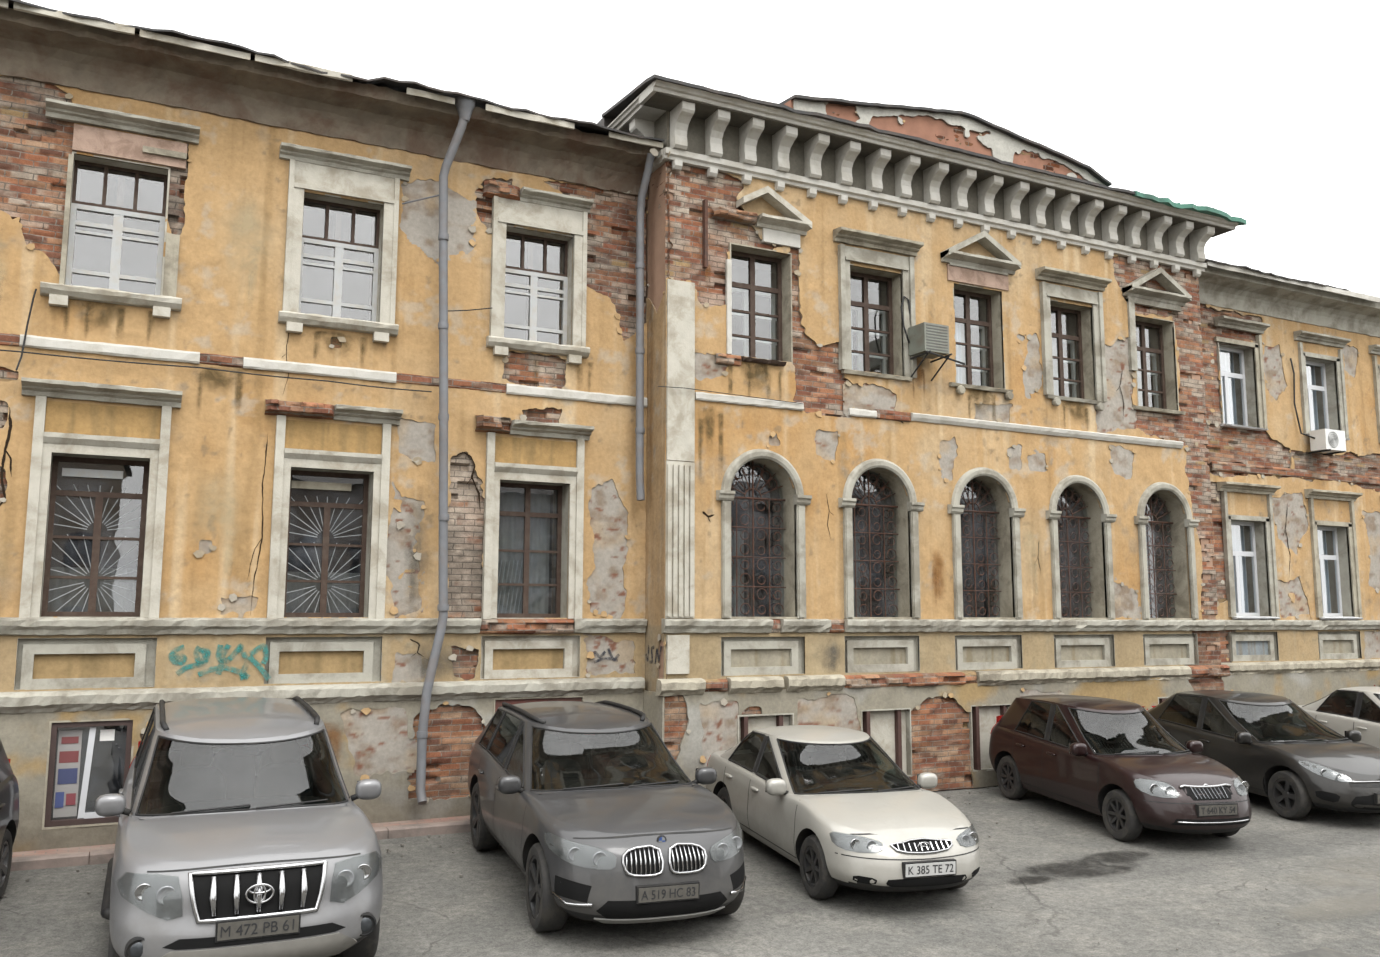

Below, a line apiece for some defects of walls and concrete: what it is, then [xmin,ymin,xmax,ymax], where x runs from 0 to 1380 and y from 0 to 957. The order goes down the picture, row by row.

flaking render [0,76,74,275]
flaking render [935,126,986,146]
flaking render [1020,151,1084,180]
flaking render [545,148,896,464]
flaking render [0,401,8,428]
flaking render [0,367,19,382]
peeling [386,477,426,618]
flaking render [396,418,484,618]
flaking render [1094,249,1380,691]
flaking render [340,701,485,803]
flaking render [907,692,973,791]